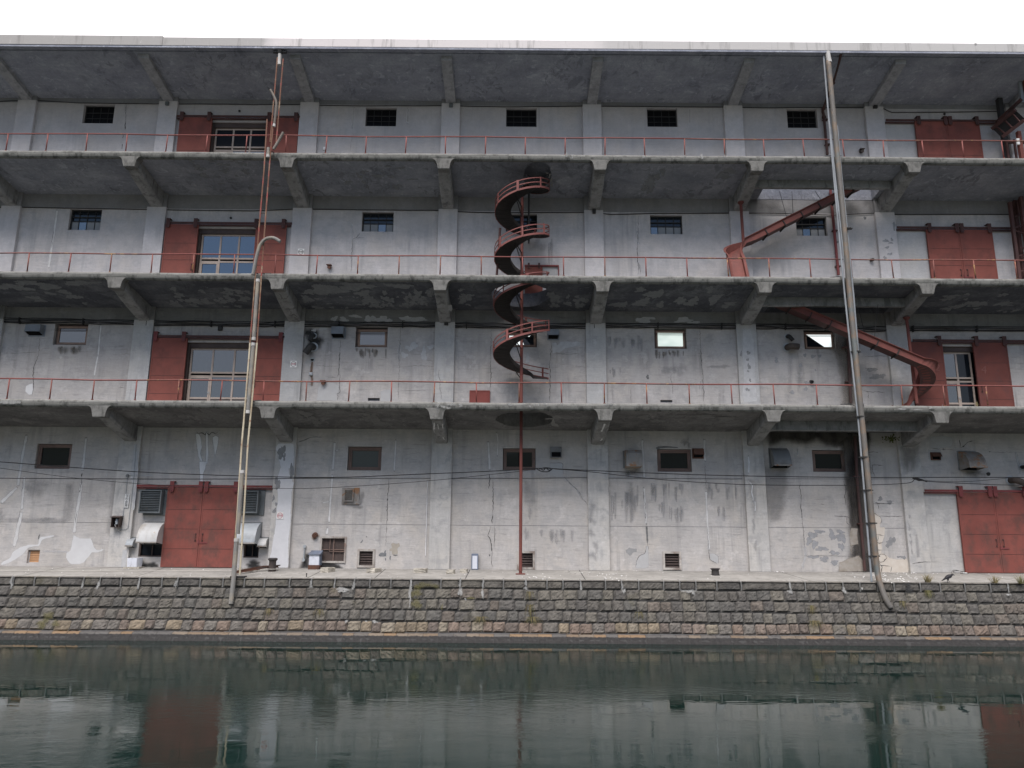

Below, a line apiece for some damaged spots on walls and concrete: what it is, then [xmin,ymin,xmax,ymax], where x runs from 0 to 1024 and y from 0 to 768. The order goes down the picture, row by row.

crack [487,433,499,564]
damp [768,432,874,572]
peeling [806,496,918,583]